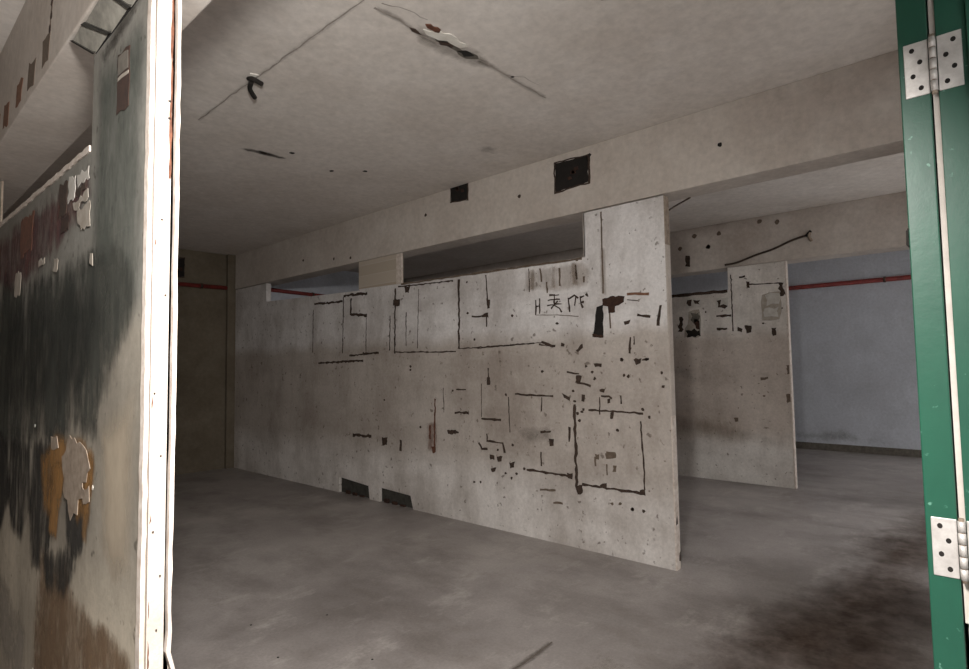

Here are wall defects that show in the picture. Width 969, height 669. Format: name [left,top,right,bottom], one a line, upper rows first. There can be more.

crack [478,59,546,98]
damp [0,40,140,669]
peeling [51,435,93,520]
crack [512,642,552,669]